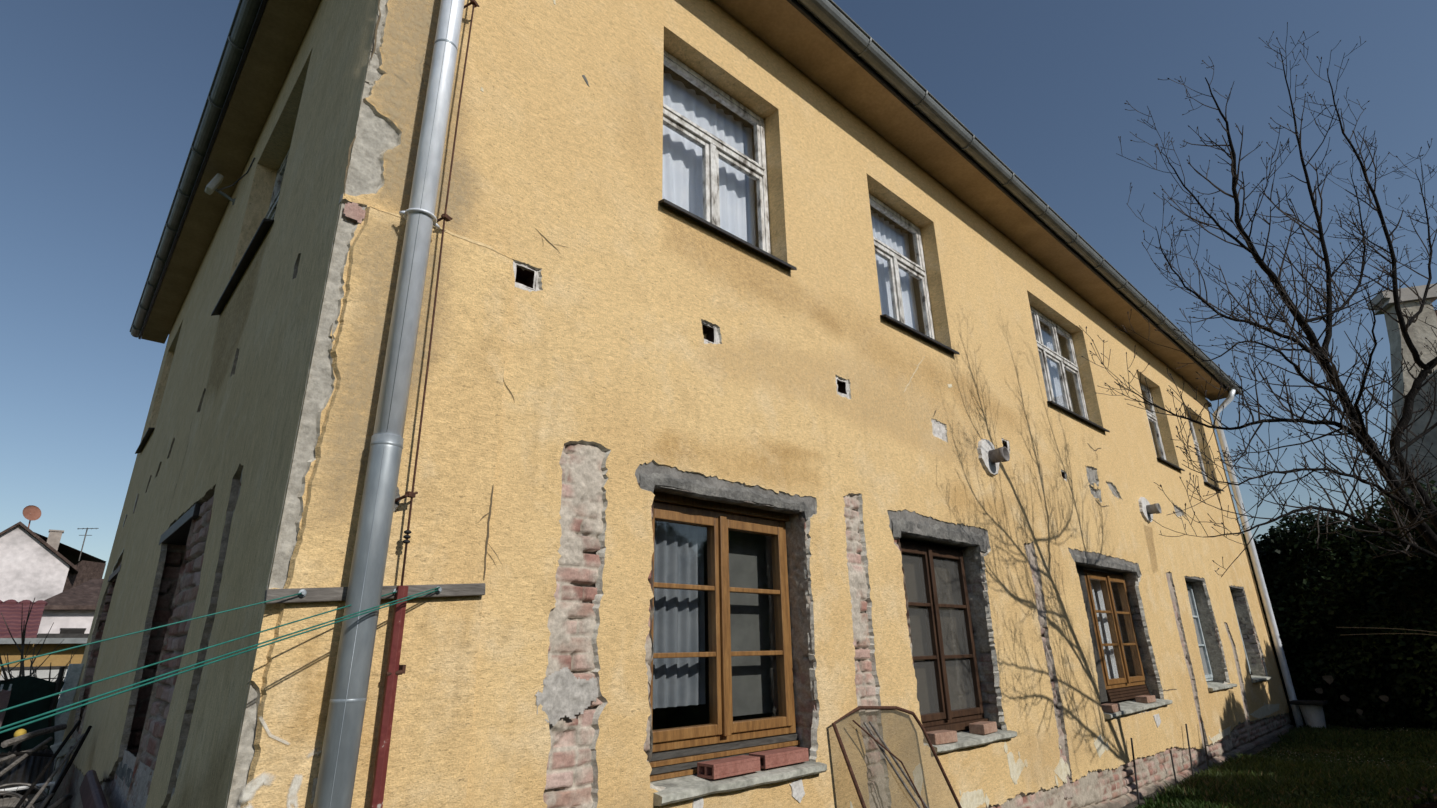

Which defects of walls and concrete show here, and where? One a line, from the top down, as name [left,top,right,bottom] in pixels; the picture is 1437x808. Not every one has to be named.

flaking render [267,0,402,589]
flaking render [49,464,243,808]
flaking render [535,440,611,808]
flaking render [635,460,820,762]
flaking render [843,493,892,808]
flaking render [887,509,1295,808]